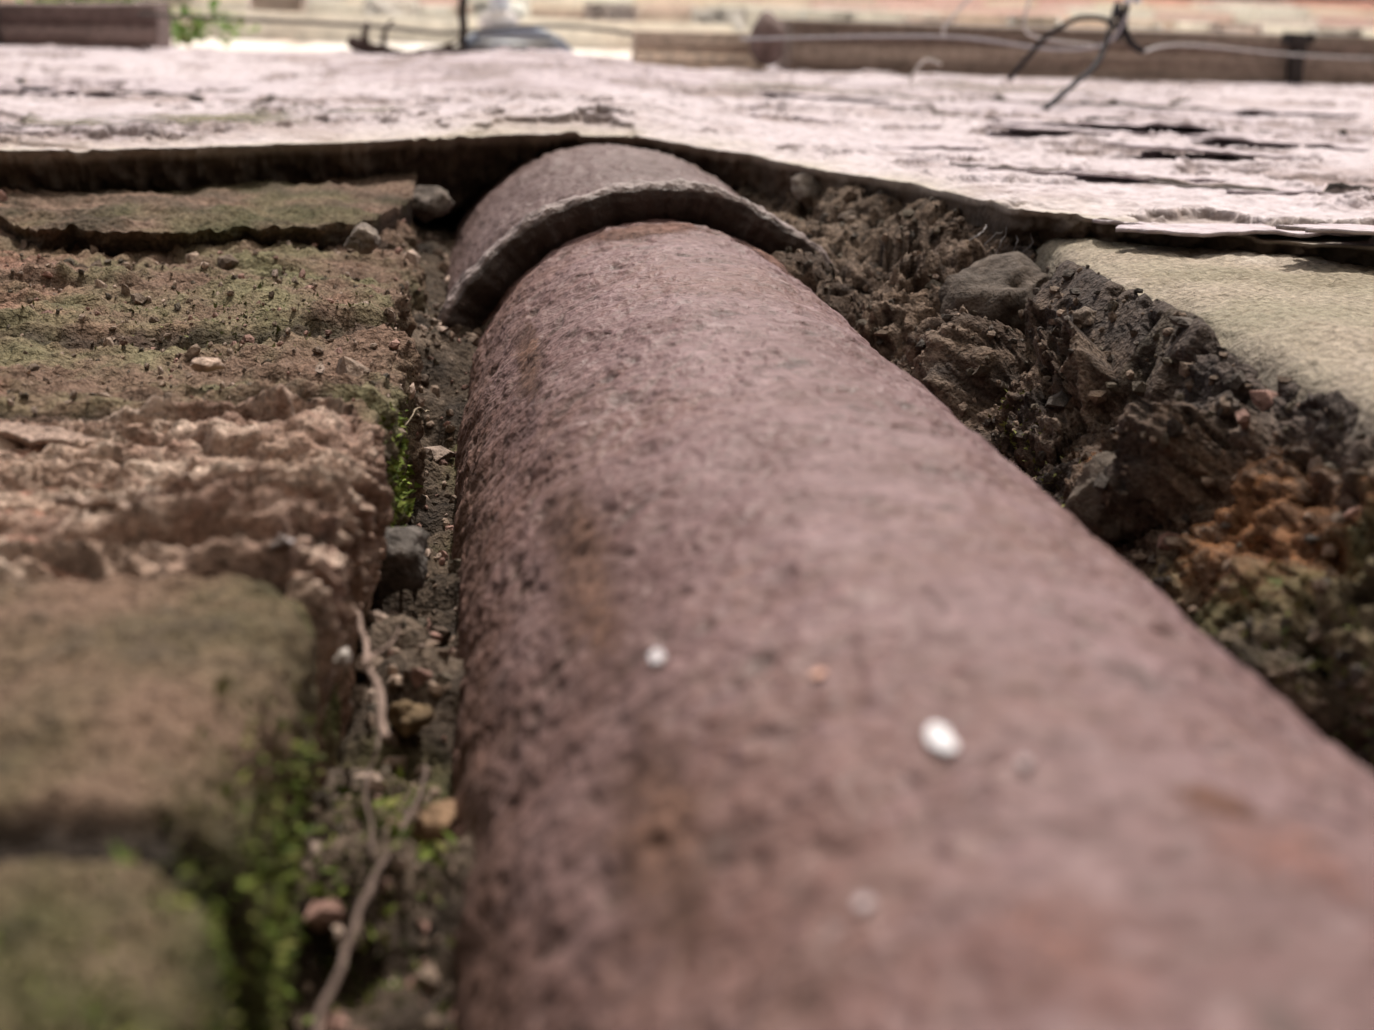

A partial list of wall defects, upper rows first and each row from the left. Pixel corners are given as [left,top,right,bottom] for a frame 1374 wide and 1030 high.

crack [837,91,1374,136]
crack [949,162,1374,193]